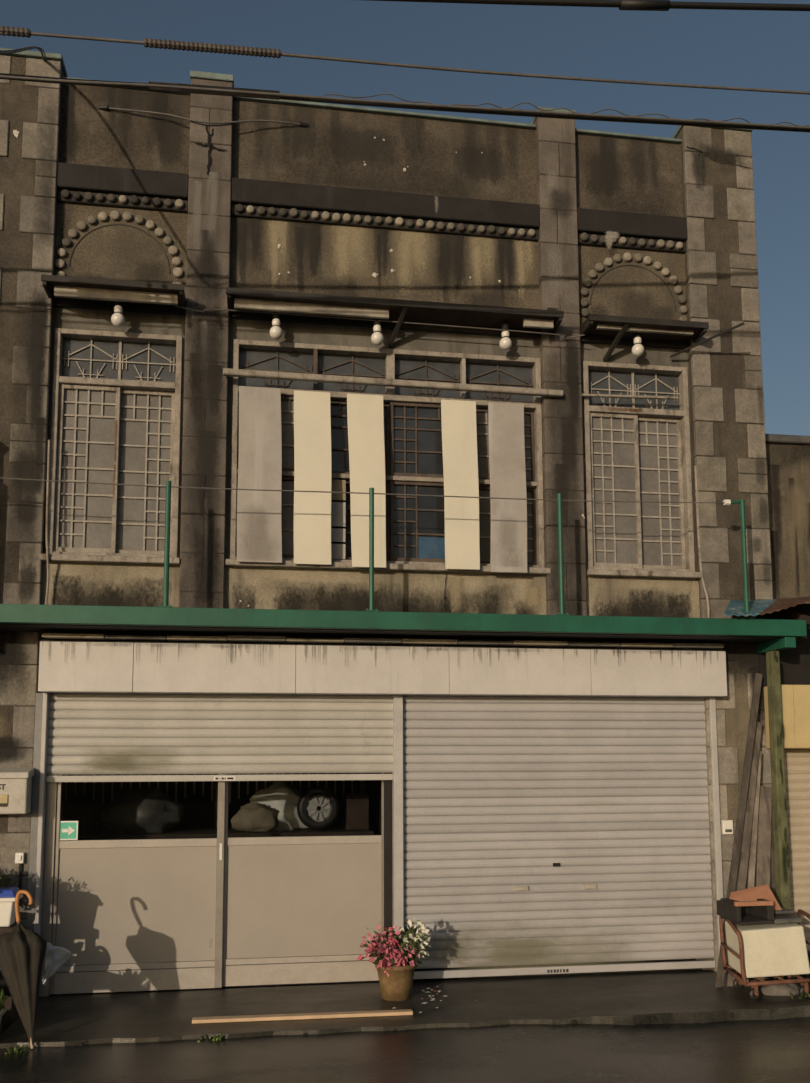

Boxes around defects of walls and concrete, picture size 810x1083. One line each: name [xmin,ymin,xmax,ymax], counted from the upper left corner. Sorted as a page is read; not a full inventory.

damp [196,230,216,294]
damp [295,221,321,289]
damp [375,228,412,291]
damp [438,233,482,289]
damp [497,238,525,293]
damp [191,308,222,606]
damp [771,464,799,590]
damp [55,582,163,607]
damp [278,577,497,614]
damp [597,595,690,618]